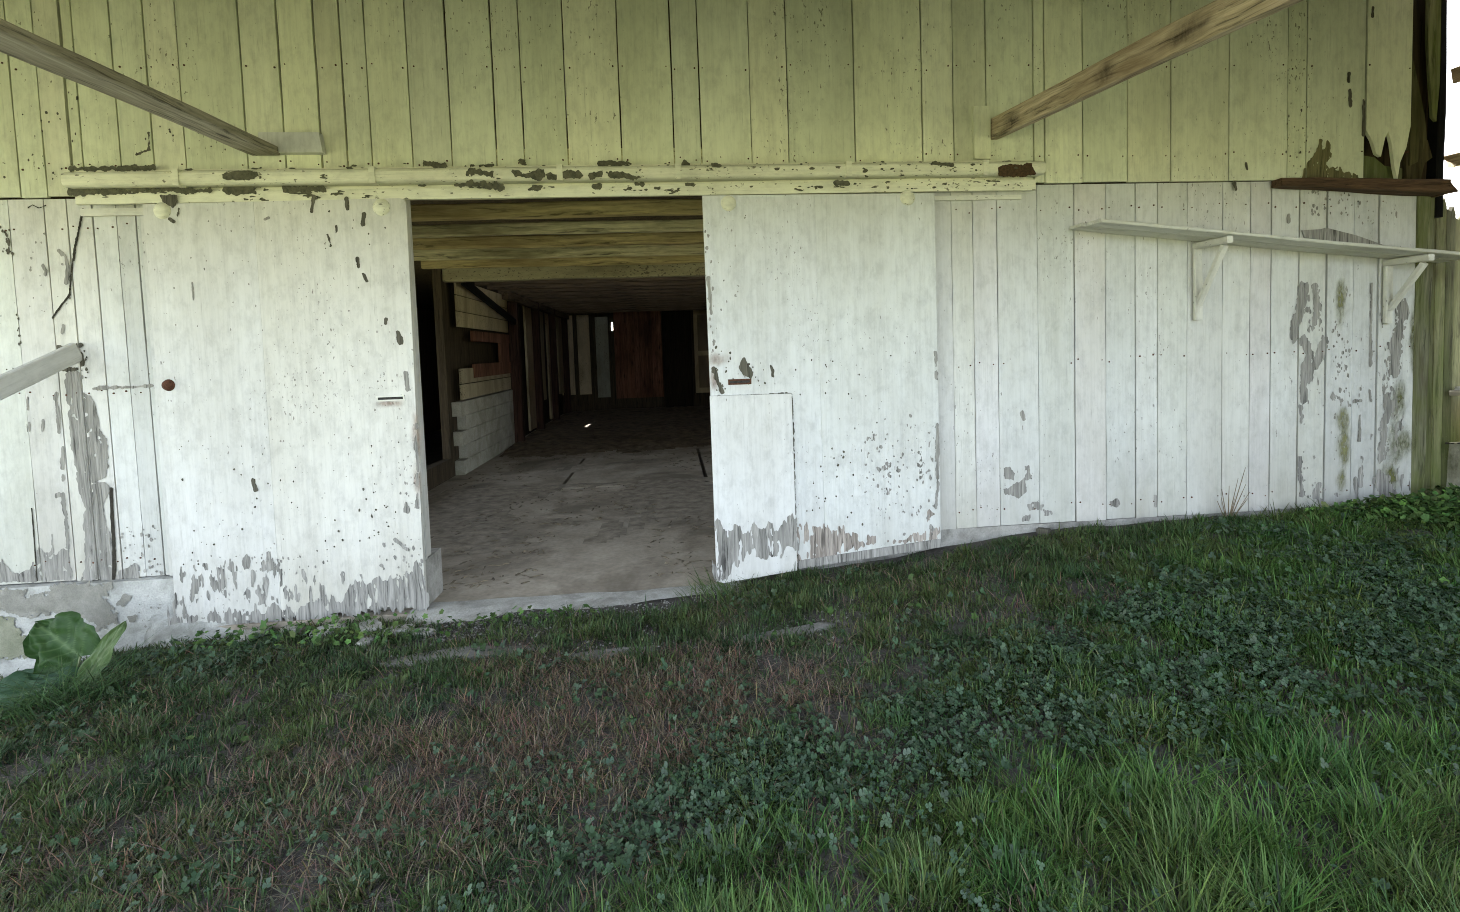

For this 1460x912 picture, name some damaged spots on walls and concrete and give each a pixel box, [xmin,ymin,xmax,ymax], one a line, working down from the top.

peeling [1347,72,1366,137]
peeling [403,158,726,194]
peeling [760,160,1020,191]
peeling [1285,106,1374,225]
peeling [0,226,71,312]
crack [52,208,84,319]
peeling [359,317,403,352]
peeling [704,223,940,582]
peeling [1290,281,1413,508]
peeling [0,324,430,660]